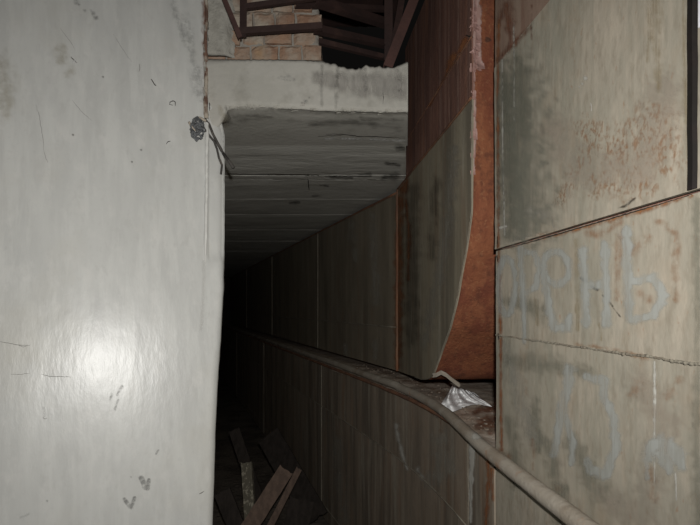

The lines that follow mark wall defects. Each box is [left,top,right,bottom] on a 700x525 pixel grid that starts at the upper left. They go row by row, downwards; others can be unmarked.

rust [473,226,503,451]